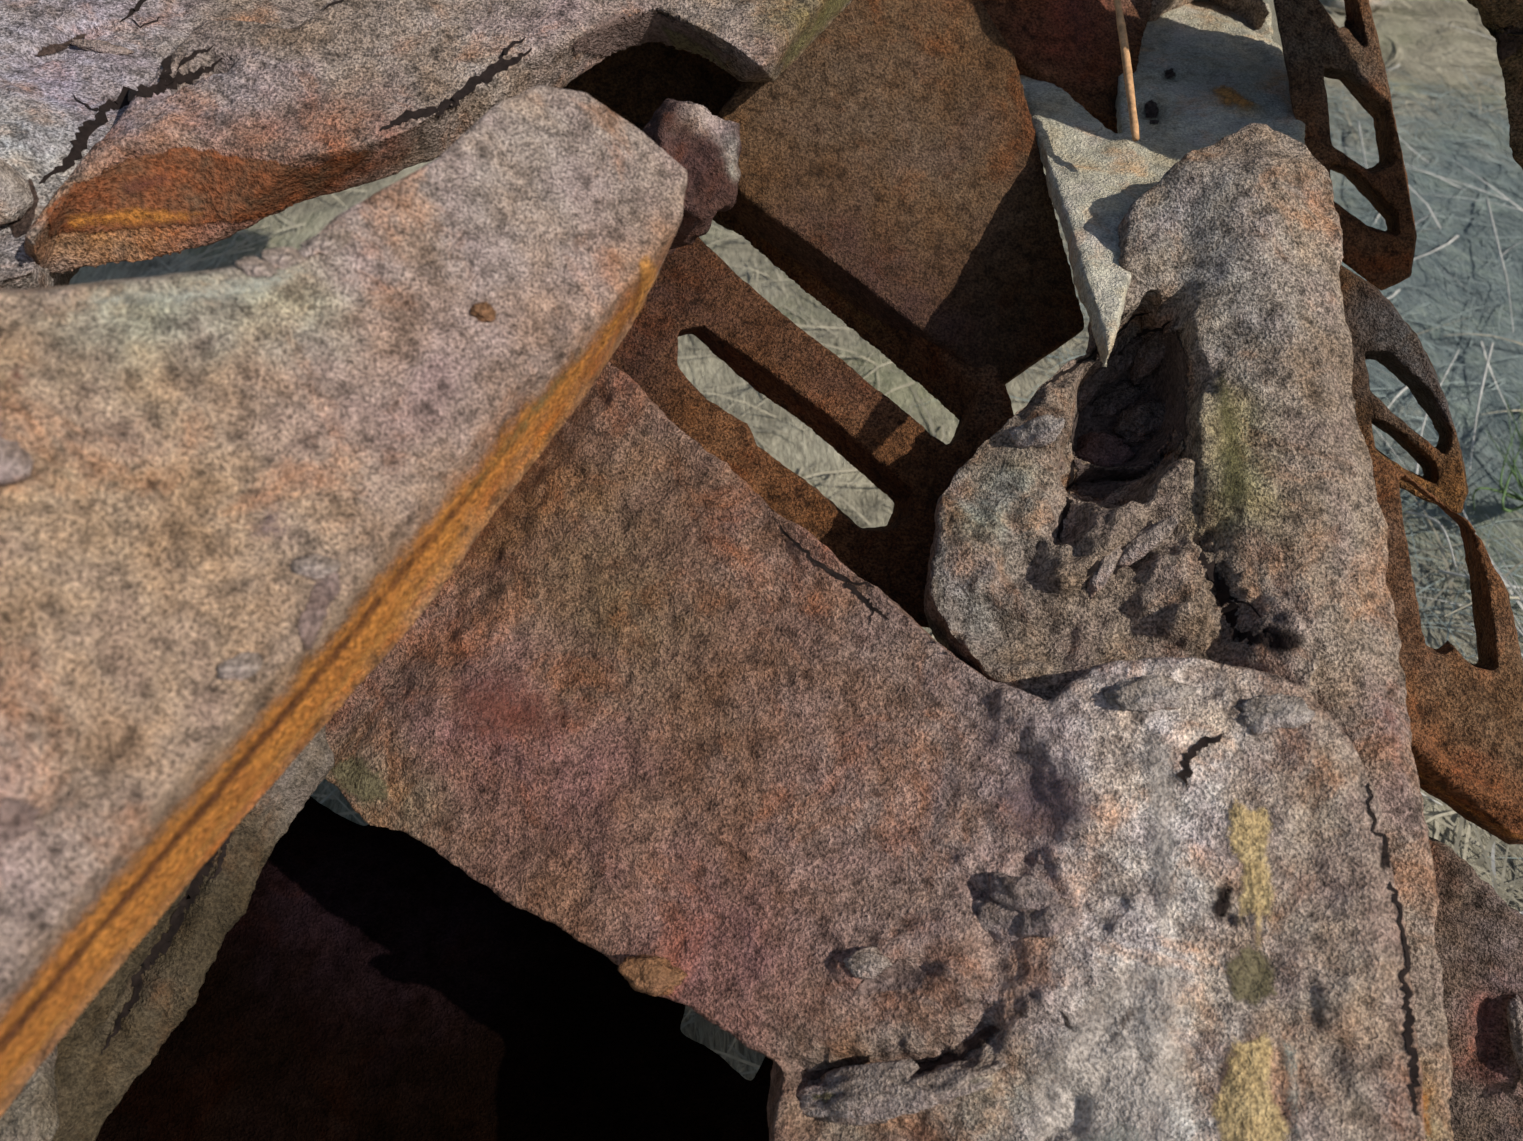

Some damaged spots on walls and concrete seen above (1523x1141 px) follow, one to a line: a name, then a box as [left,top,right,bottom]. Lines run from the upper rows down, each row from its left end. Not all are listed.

crack [120,0,162,28]
crack [39,43,223,184]
crack [380,37,532,131]
crack [767,510,889,624]
crack [1198,541,1274,646]
crack [1176,733,1226,787]
crack [1366,775,1421,1116]